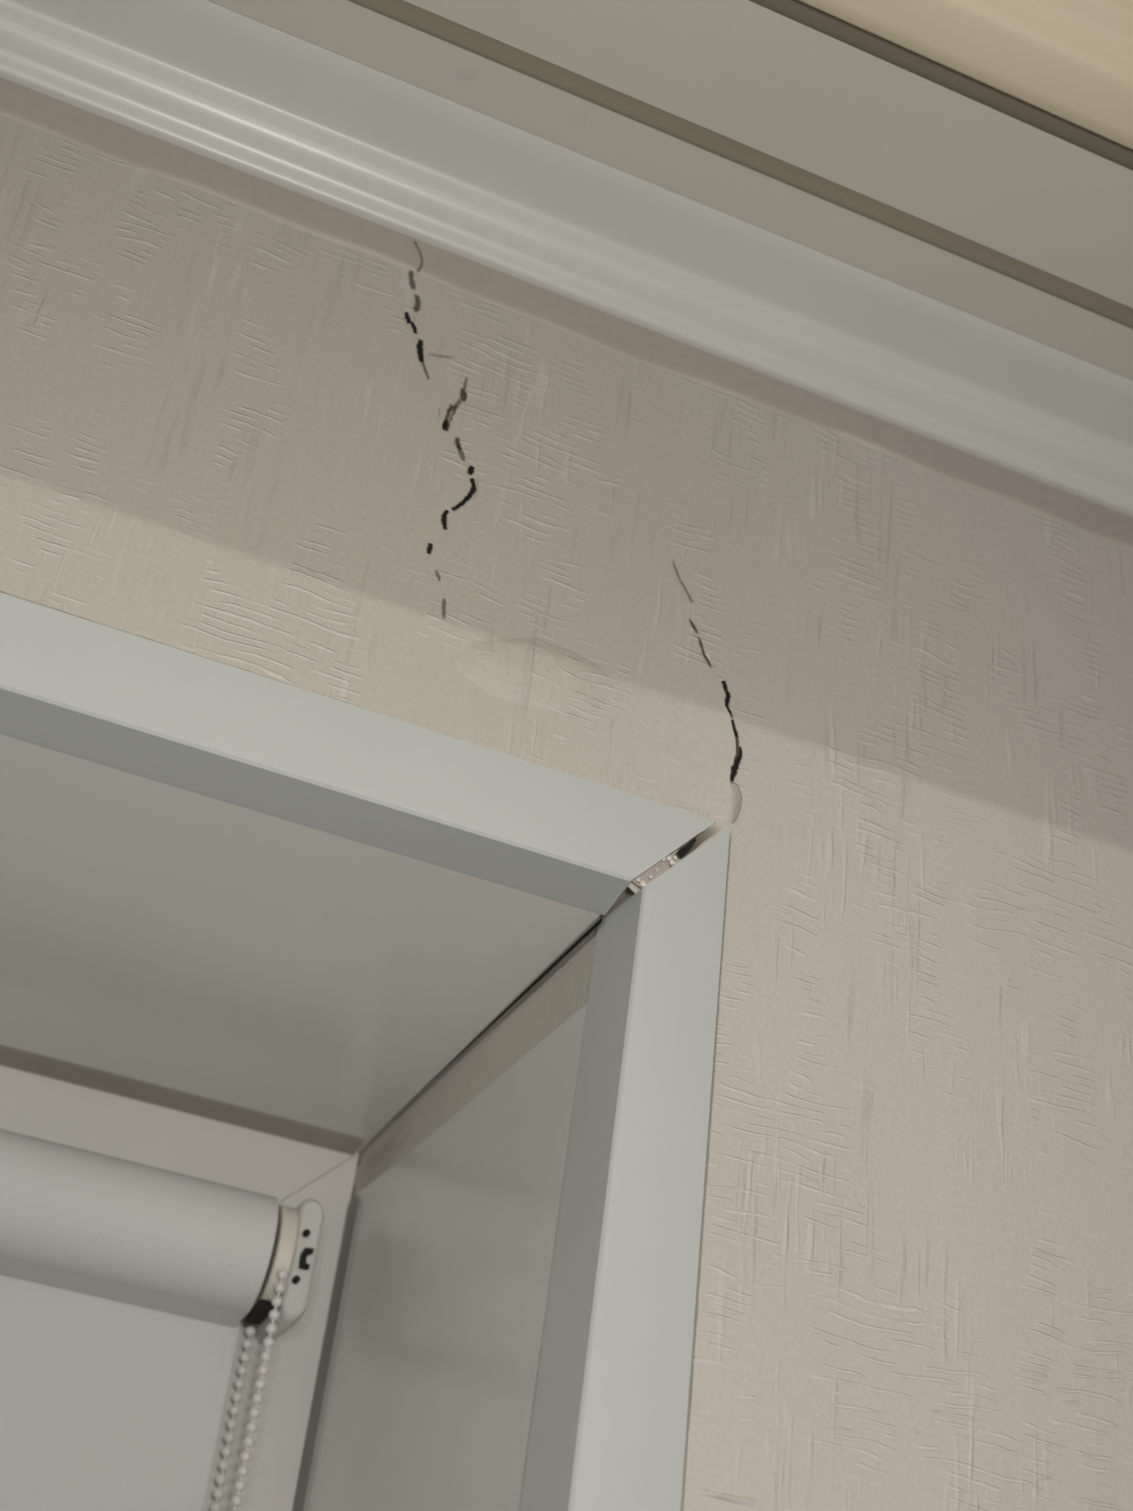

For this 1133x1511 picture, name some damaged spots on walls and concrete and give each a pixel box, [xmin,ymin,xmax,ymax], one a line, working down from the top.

crack [405,241,479,617]
crack [674,565,742,781]